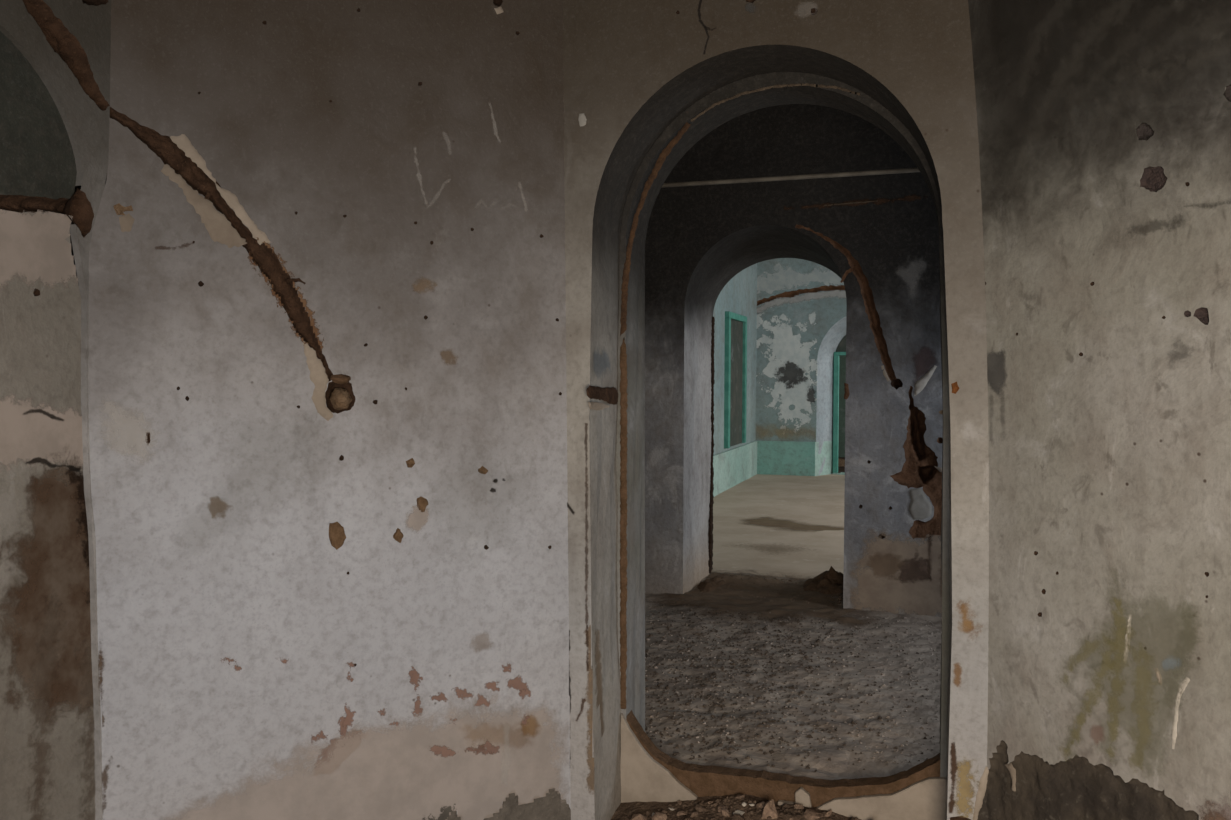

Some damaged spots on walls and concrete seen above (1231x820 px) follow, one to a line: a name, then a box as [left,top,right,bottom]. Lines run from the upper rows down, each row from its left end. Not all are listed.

crack [23,0,333,392]
spalling [1140,166,1167,192]
crack [757,194,921,390]
spalling [586,83,860,709]
spalling [890,347,943,539]
peeling [409,664,531,716]
peeling [311,704,362,766]
spalling [423,804,461,820]
peeling [431,740,500,758]
spalling [484,788,571,820]
spalling [950,740,1231,820]